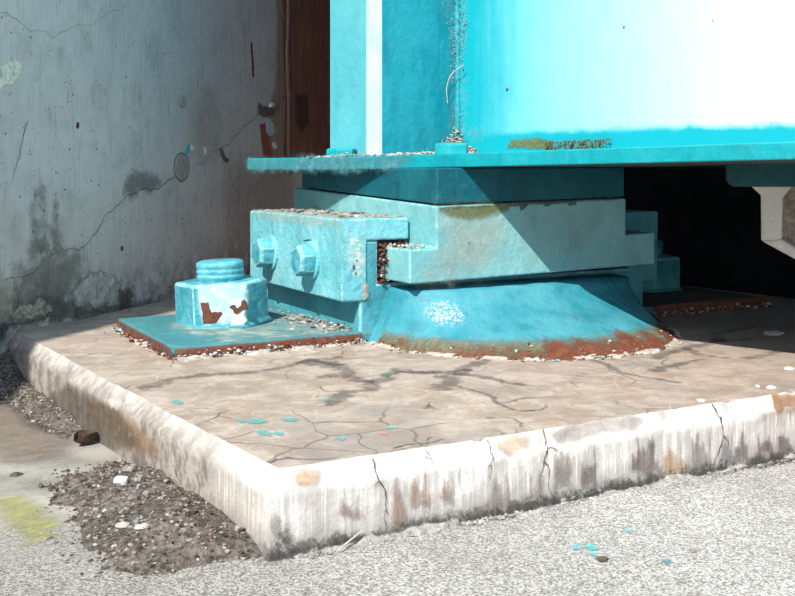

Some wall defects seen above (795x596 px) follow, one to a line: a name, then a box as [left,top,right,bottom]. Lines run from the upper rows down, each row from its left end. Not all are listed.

crack [0,95,295,284]
water stain [0,318,17,346]
crack [8,272,116,326]
water stain [51,286,148,318]
peeling [200,299,248,324]
rust [116,319,363,360]
rust [378,296,771,360]
crack [541,429,563,492]
crack [712,404,730,461]
crack [372,459,389,533]